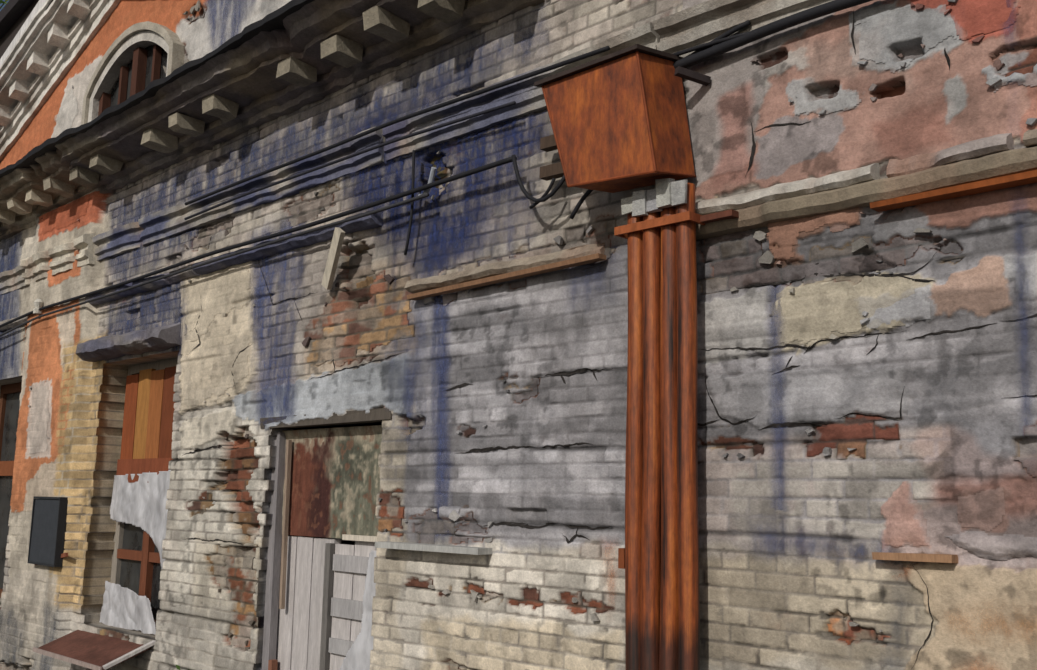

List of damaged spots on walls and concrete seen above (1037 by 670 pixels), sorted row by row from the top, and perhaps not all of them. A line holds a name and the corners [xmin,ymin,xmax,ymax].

peeling [857,0,1021,73]
peeling [788,83,879,116]
spalling [986,45,1037,93]
spalling [439,215,616,276]
crack [750,252,937,288]
spalling [302,248,526,366]
crack [701,314,1037,375]
crack [697,376,905,430]
spalling [187,427,260,651]
spalling [405,579,450,595]
spalling [463,584,613,621]
crack [911,568,934,669]